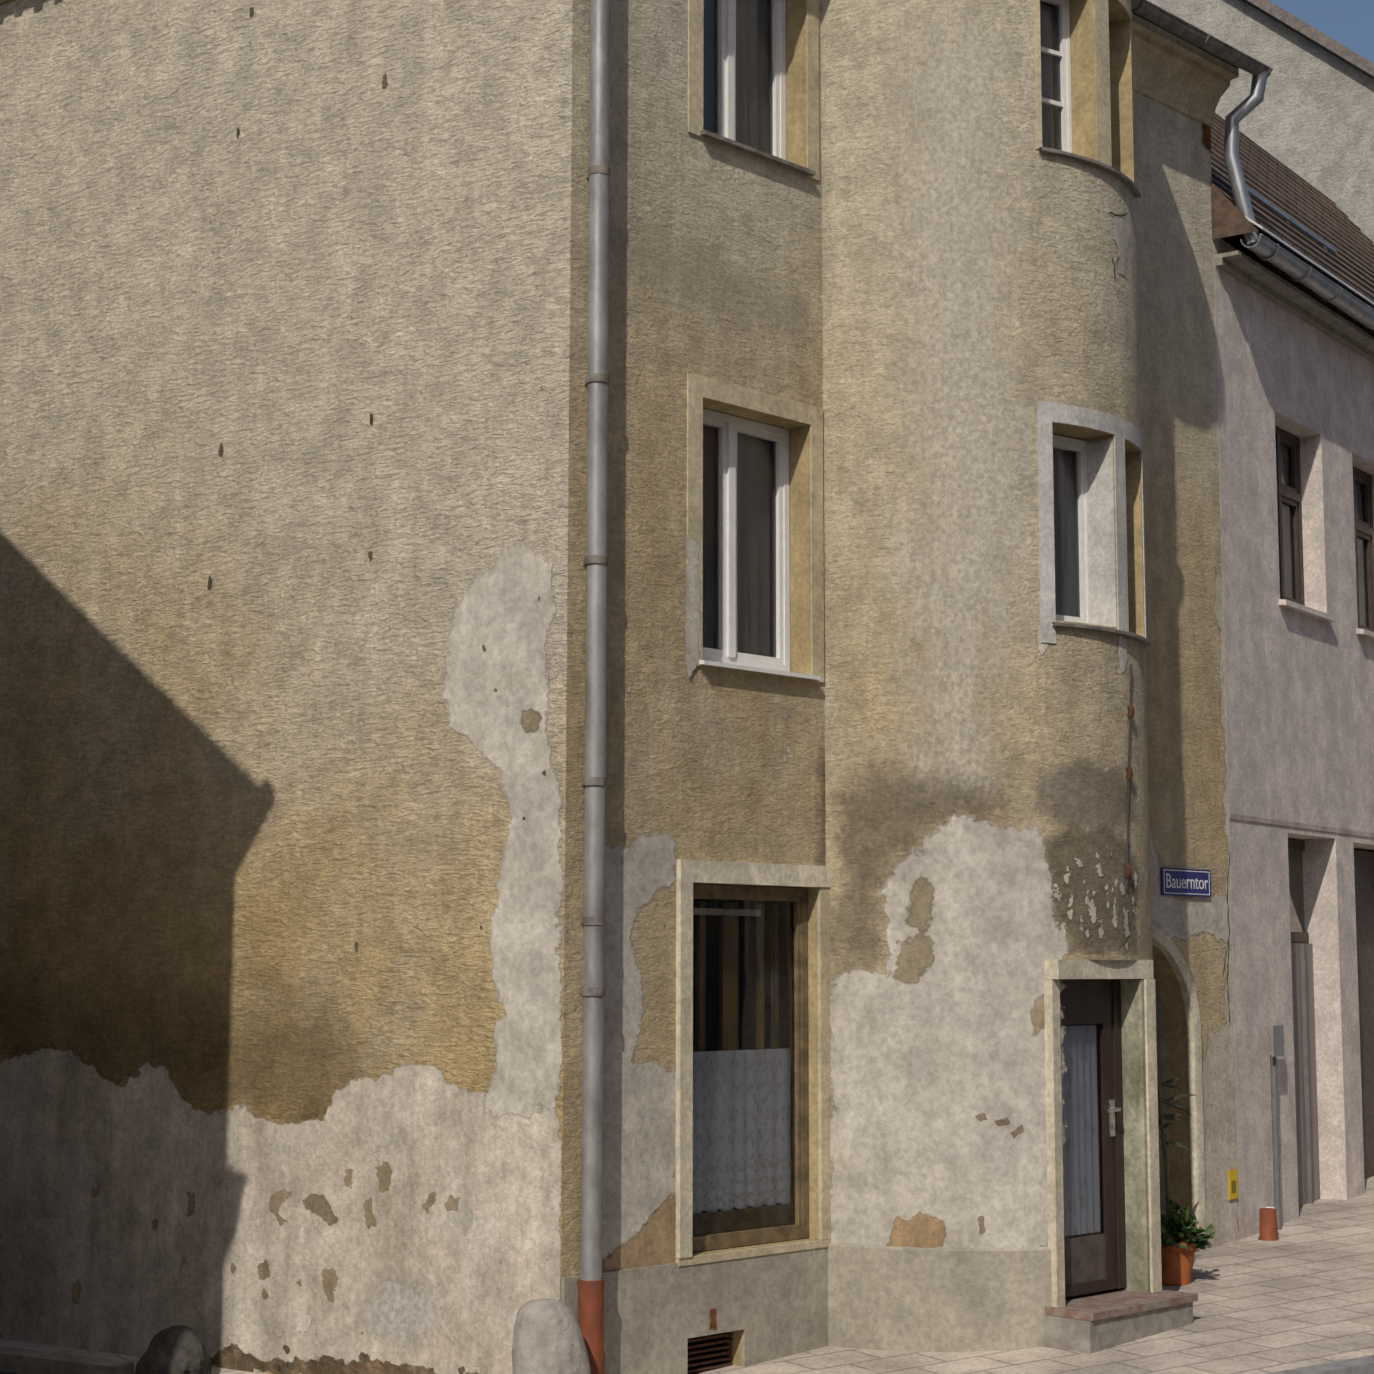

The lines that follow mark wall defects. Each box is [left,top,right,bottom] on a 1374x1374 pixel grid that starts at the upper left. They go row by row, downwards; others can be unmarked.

spalling [507,705,542,733]
peeling [1053,845,1147,951]
flaking render [0,1048,561,1374]
peeling [602,1196,676,1273]